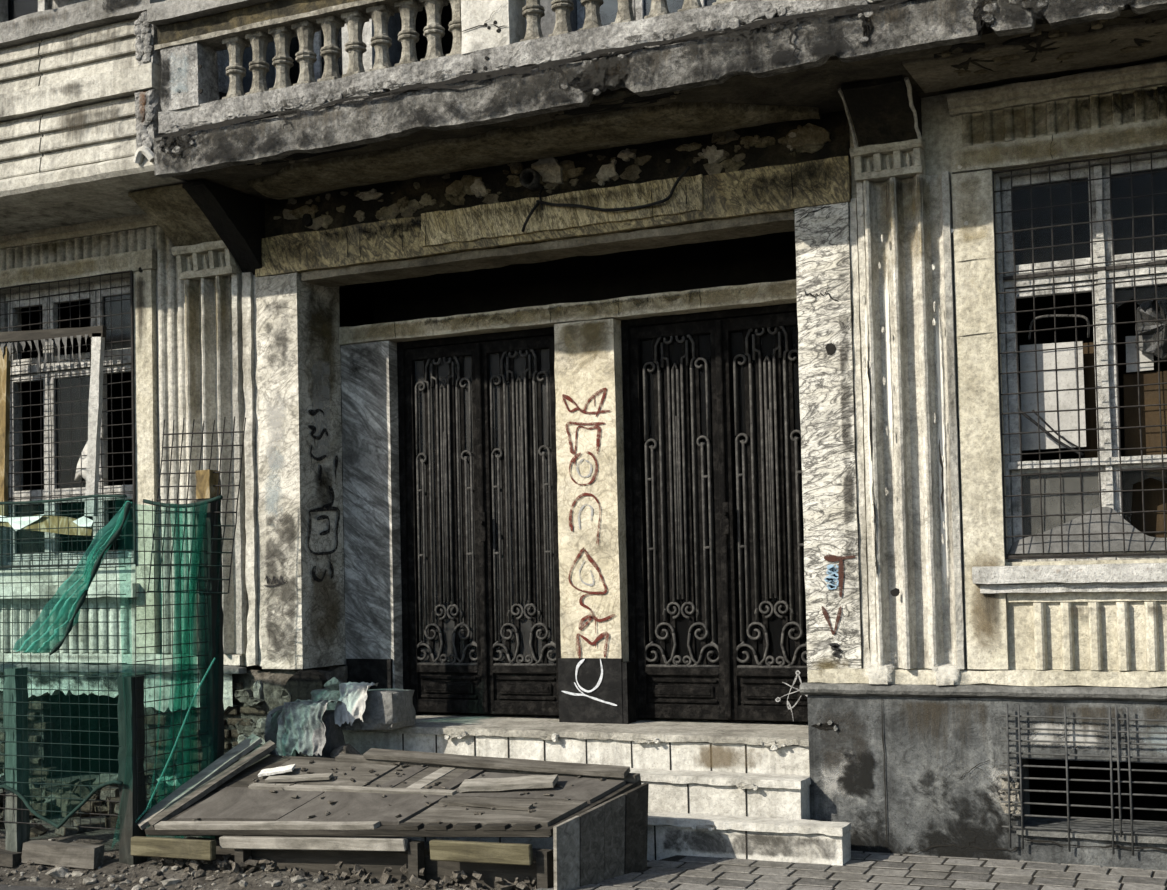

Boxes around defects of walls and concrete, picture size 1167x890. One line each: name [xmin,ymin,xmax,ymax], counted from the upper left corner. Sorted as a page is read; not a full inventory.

spalling [845,0,886,44]
spalling [934,0,1079,76]
spalling [441,56,516,84]
spalling [156,81,425,155]
spalling [247,141,380,166]
peeling [274,170,522,230]
peeling [531,148,652,193]
peeling [665,123,831,175]
damp [823,712,874,798]
damp [850,771,1021,860]